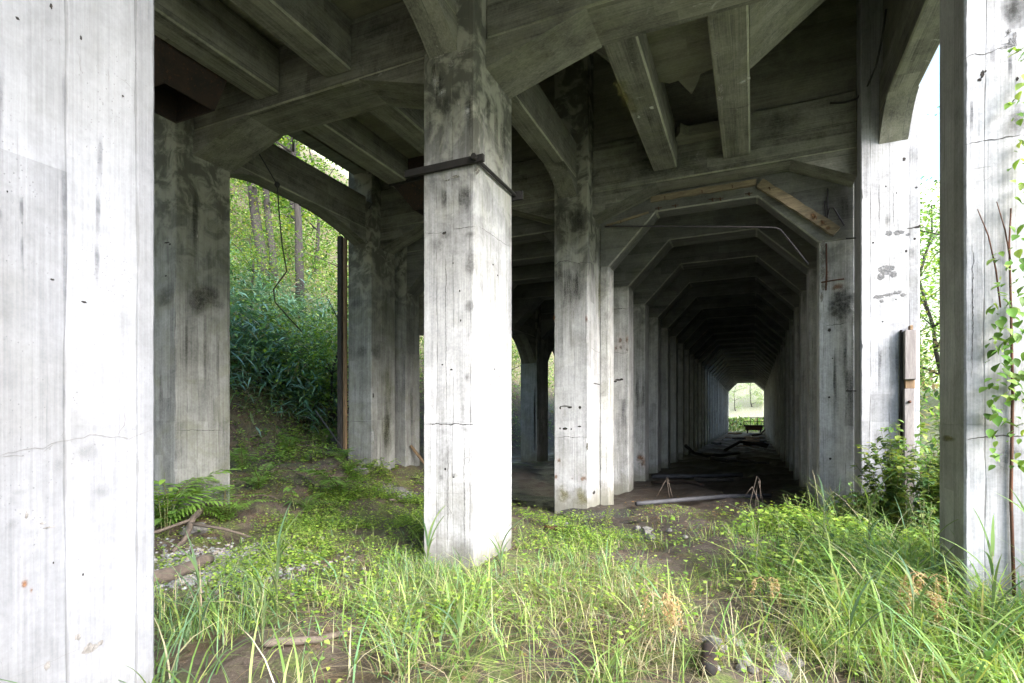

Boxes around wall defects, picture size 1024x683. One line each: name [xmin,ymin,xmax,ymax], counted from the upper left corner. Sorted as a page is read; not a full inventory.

corrosion [821,243,844,290]
crack [3,413,148,457]